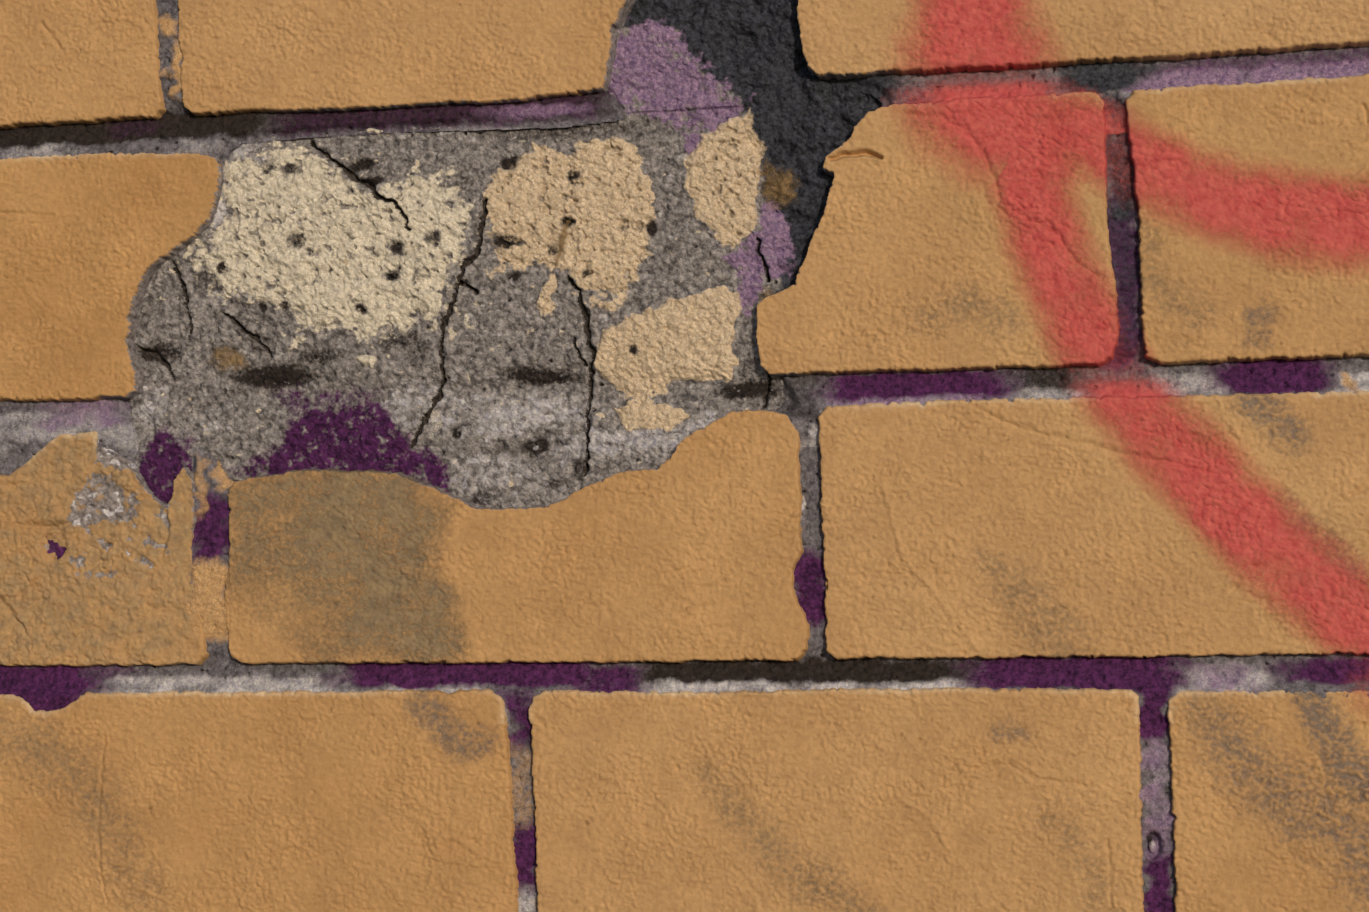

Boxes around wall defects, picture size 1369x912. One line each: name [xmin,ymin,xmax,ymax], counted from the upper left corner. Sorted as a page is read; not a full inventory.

crack [139,261,273,381]
crack [310,141,411,231]
crack [409,199,488,448]
spalling [39,0,883,567]
crack [568,276,597,477]